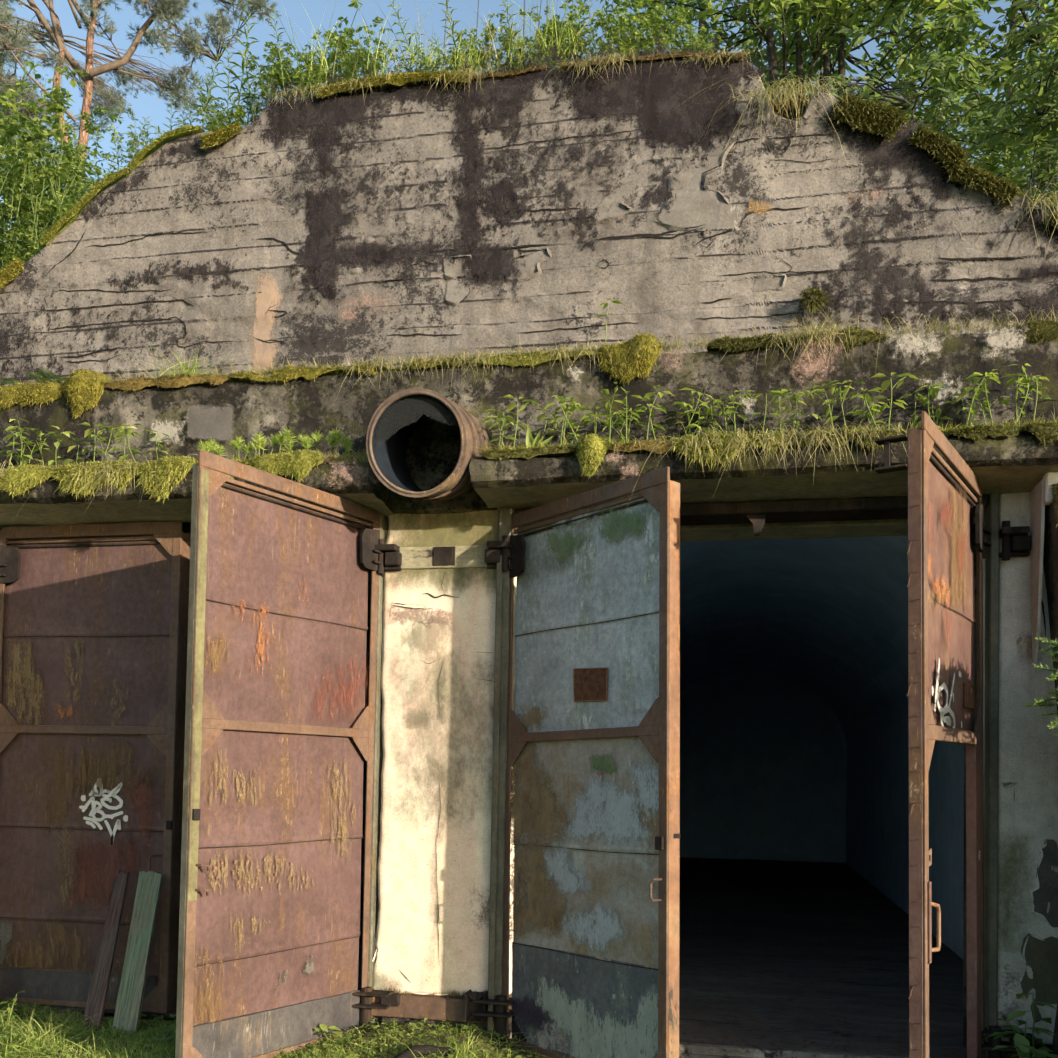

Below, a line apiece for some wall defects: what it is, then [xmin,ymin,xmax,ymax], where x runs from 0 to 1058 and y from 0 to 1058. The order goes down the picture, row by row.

damp [249,32,783,347]
crack [45,230,288,363]
crack [597,206,808,268]
crack [696,261,826,319]
crack [890,257,1055,304]
damp [393,510,499,547]
damp [394,567,496,588]
corrosion [6,637,84,725]
corrosion [329,761,357,857]
corrosion [510,705,572,942]
corrosion [206,850,314,895]
flaking render [1021,838,1058,1023]